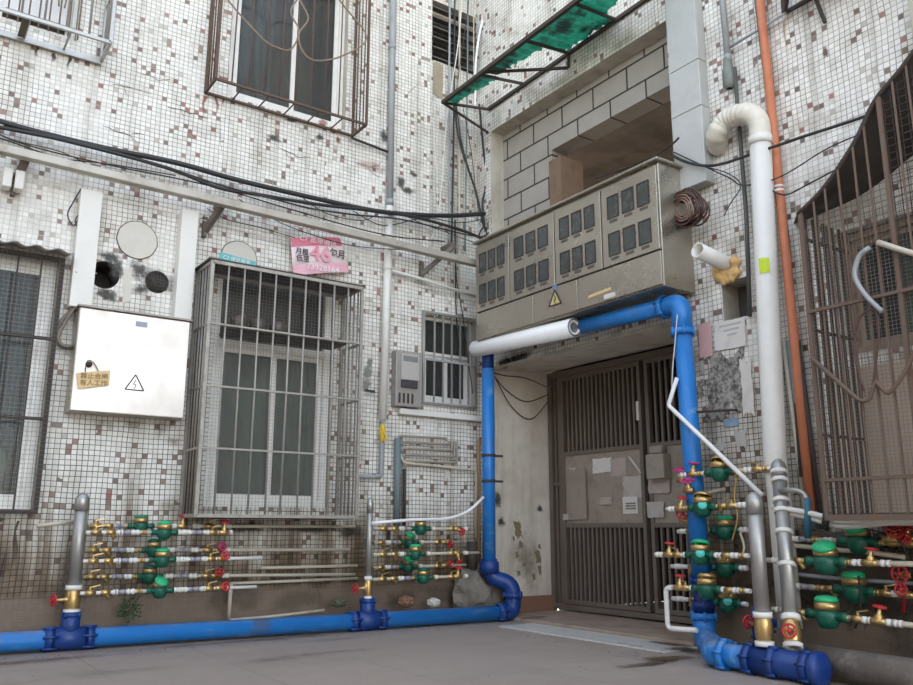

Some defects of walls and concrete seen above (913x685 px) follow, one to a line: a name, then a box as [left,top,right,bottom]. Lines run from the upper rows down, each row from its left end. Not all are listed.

spalling [696,346,744,422]
damp [0,521,20,575]